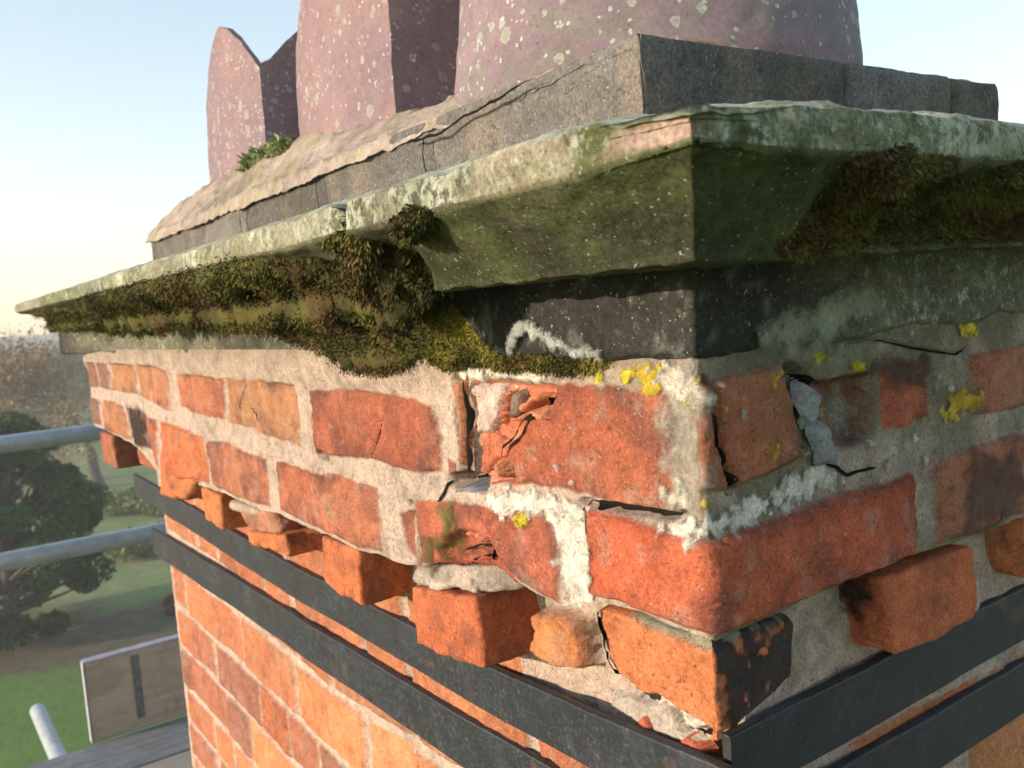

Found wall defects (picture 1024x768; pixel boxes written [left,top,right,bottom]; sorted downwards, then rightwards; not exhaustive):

crack [405,79,531,172]
crack [786,374,814,386]
crack [847,340,970,355]
spalling [452,379,557,483]
crack [711,412,738,487]
crack [826,463,877,477]
crack [583,499,690,519]
crack [597,606,620,674]